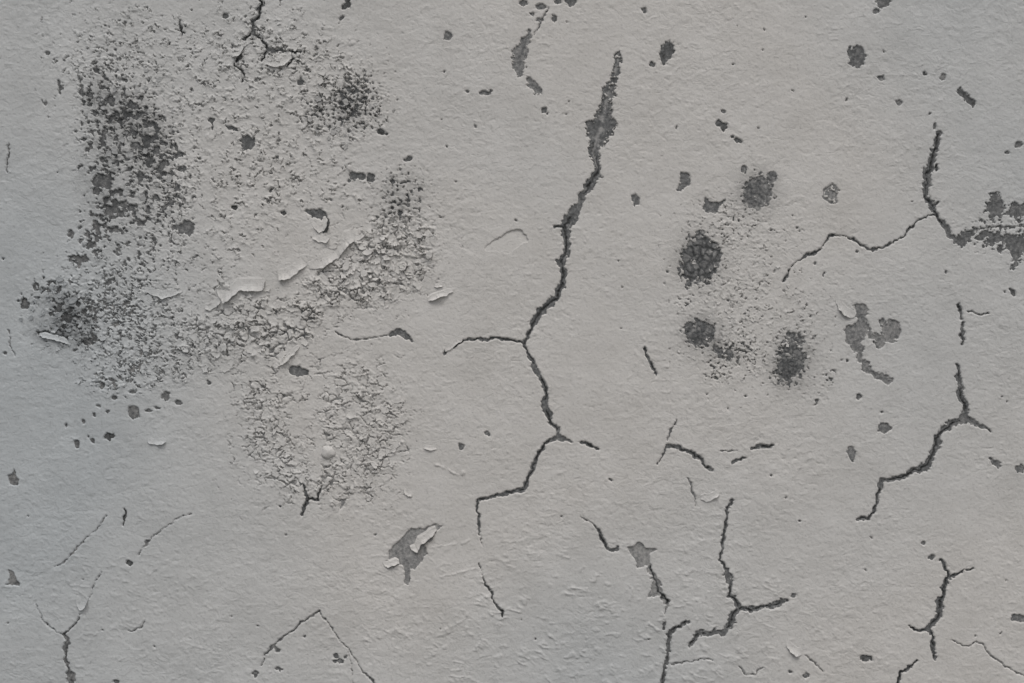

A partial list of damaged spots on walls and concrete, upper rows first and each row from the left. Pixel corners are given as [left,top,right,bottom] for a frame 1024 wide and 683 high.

peeling [511,0,576,95]
peeling [17,2,453,509]
crack [782,131,1024,282]
crack [443,51,623,617]
crack [657,420,774,506]
peeling [836,300,901,385]
crack [856,304,991,521]
peeling [383,524,442,585]
crack [649,499,789,683]
crack [897,558,1024,683]